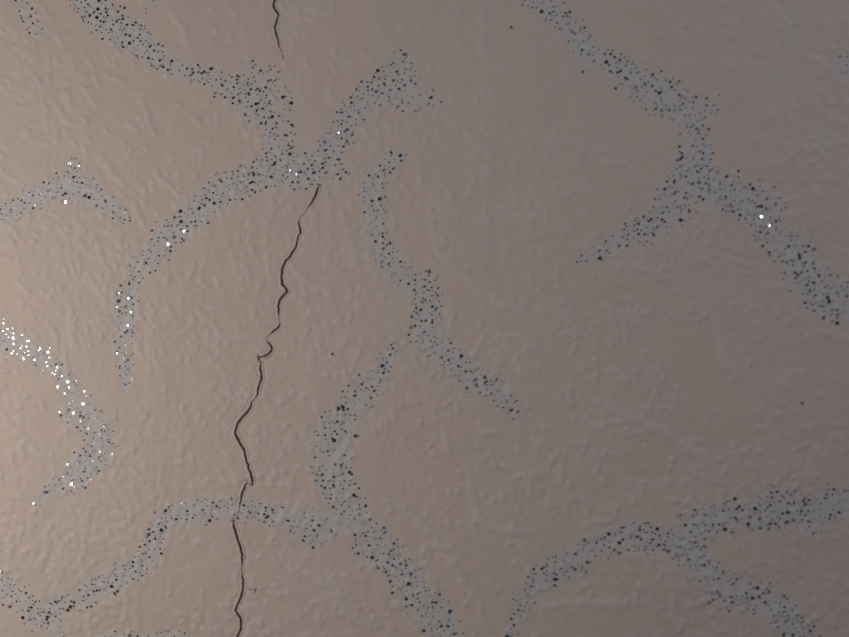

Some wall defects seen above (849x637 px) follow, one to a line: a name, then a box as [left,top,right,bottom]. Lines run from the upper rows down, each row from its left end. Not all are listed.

crack [269,0,286,59]
crack [230,184,323,637]